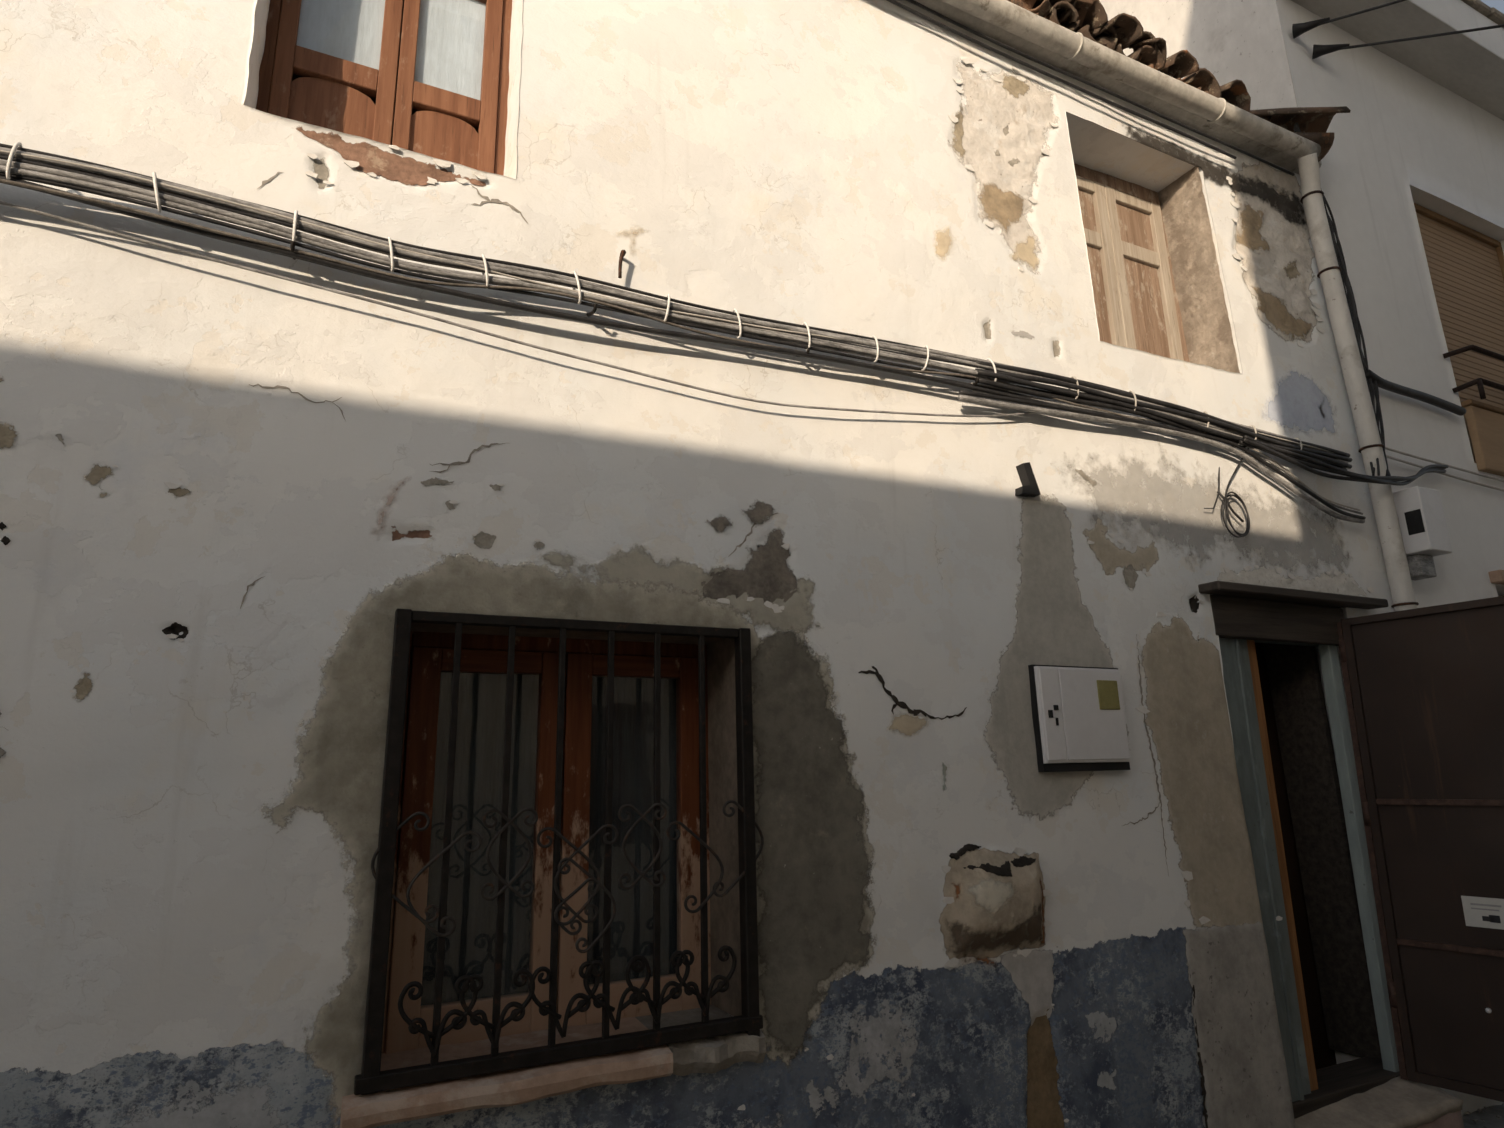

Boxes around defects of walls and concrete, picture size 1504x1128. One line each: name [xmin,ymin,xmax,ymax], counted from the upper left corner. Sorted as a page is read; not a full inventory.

flaking render [296,127,486,186]
peeling [948,56,1058,273]
flaking render [1226,161,1326,347]
flaking render [1075,469,1097,486]
flaking render [391,526,436,541]
flaking render [471,532,496,549]
flaking render [701,501,797,613]
peeling [1083,517,1159,590]
crack [858,666,967,720]